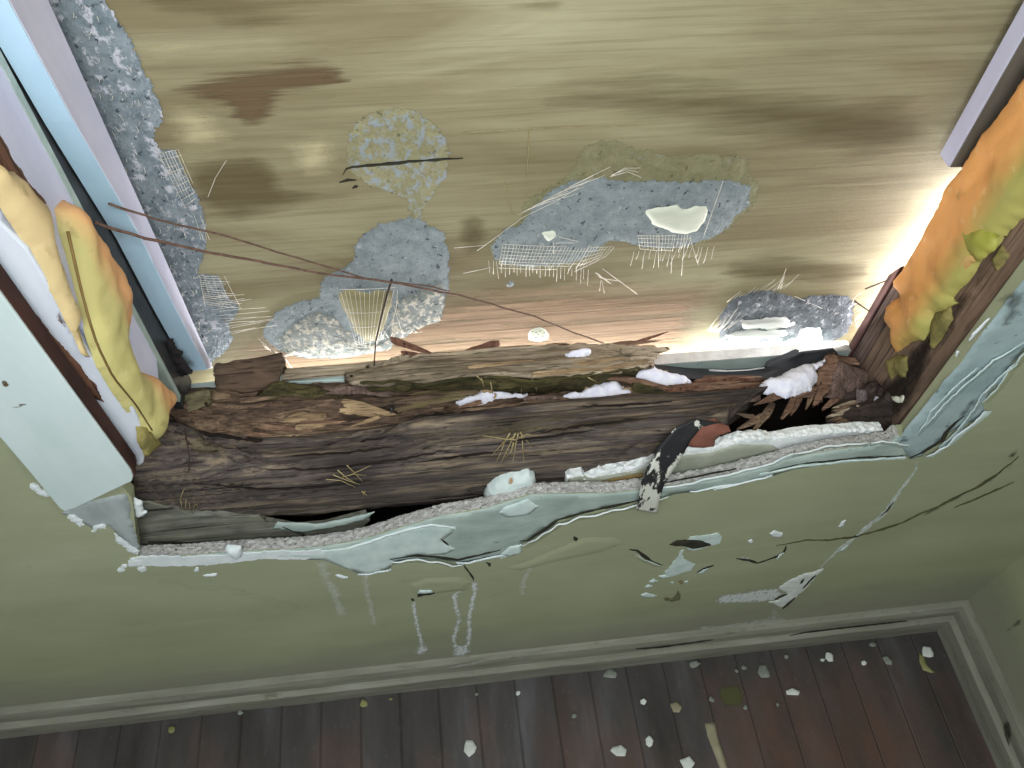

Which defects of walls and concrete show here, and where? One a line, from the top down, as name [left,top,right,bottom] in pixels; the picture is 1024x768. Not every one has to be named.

peeling [175,116,218,142]
leakage [189,68,347,121]
peeling [659,279,1024,503]
spalling [29,483,49,497]
peeling [61,454,654,579]
crack [697,456,1019,574]
peeling [641,533,722,602]
leakage [412,602,427,654]
leakage [451,583,481,667]